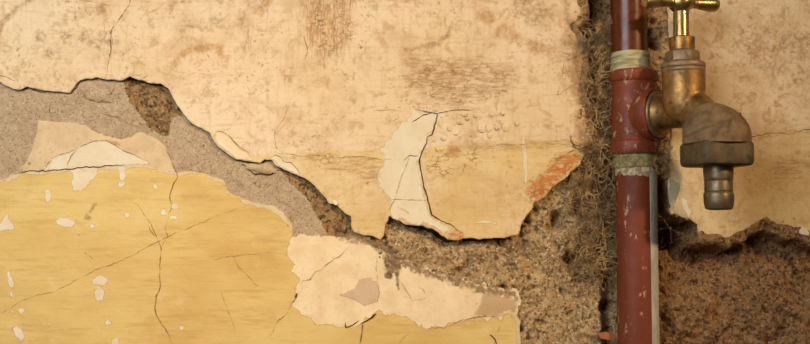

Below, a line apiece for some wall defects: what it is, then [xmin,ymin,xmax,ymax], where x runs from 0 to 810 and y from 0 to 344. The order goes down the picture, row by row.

crack [69,0,172,118]
flaking render [647,7,669,91]
crack [21,140,134,173]
crack [132,202,248,337]
crack [190,111,377,215]
flaking render [0,0,618,344]
crack [389,66,505,243]
rust [530,154,581,201]
flaking render [657,129,810,344]